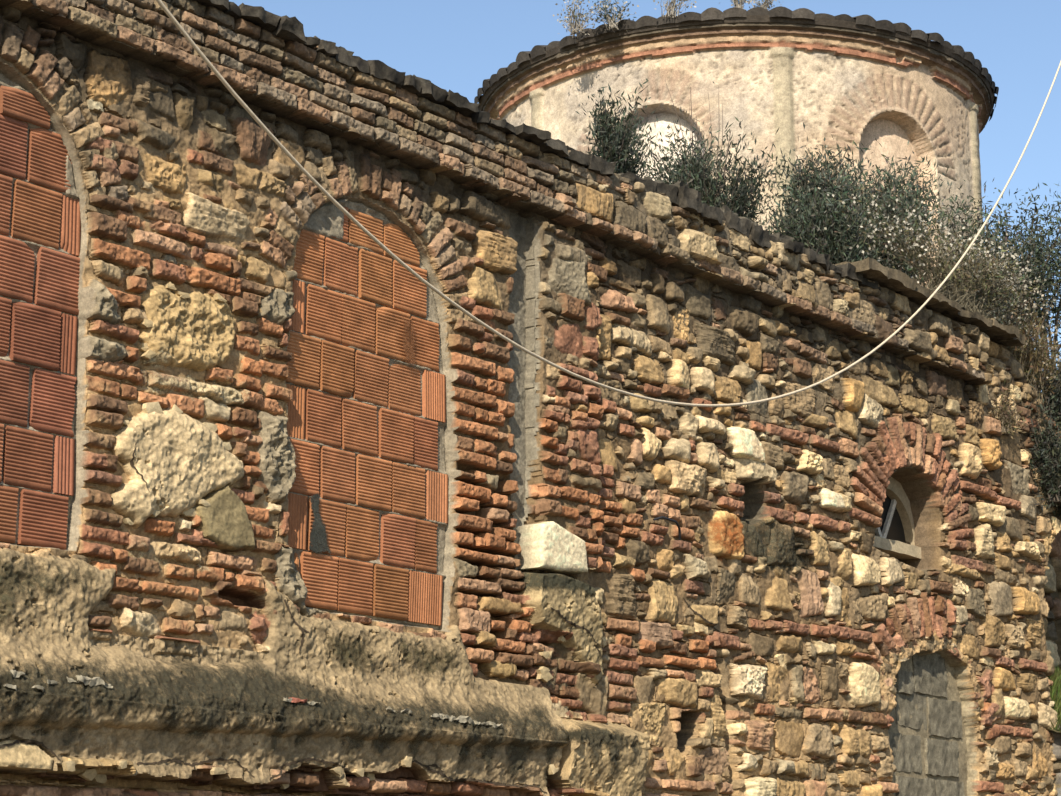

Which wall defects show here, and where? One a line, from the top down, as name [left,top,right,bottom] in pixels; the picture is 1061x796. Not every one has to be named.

hole [218,585,271,608]
crack [550,607,601,655]
crack [0,740,61,761]
spalling [179,764,231,784]